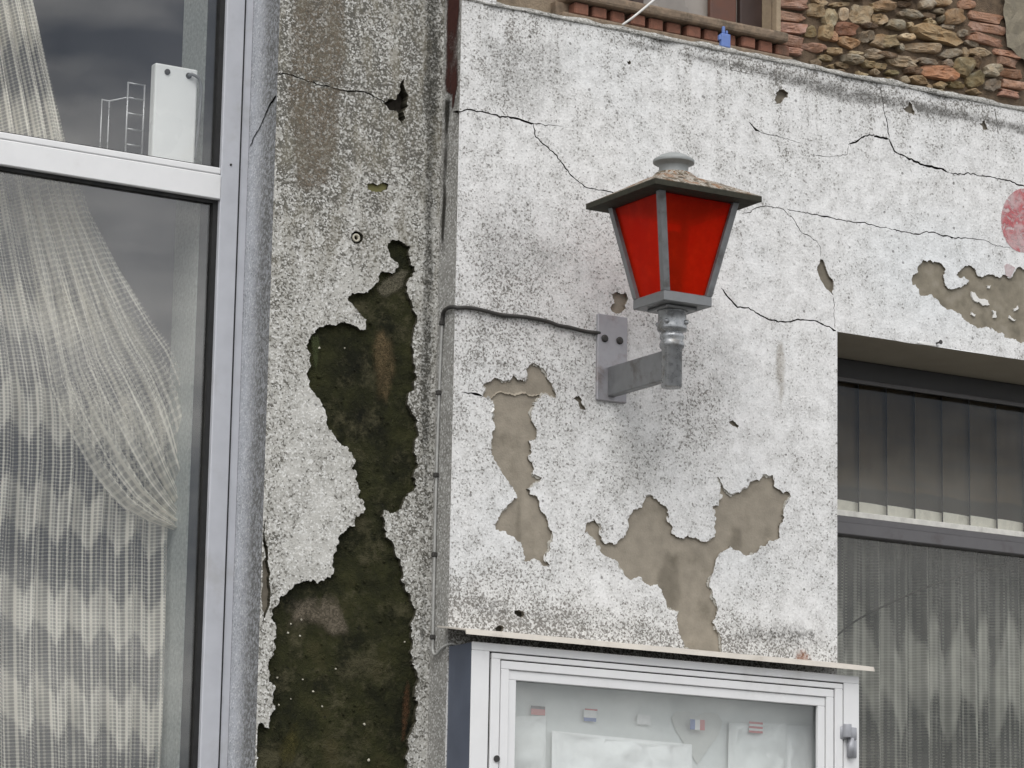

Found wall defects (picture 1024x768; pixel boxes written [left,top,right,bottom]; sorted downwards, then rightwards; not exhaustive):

crack [249,73,387,148]
flaking render [385,79,408,123]
crack [453,109,614,193]
crack [749,88,1024,186]
crack [742,206,1010,254]
crack [721,288,836,331]
flaking render [817,259,834,295]
flaking render [912,260,1024,343]
spalling [352,240,419,768]
flaking render [482,363,558,566]
flaking render [261,520,282,622]
flaking render [579,474,791,652]